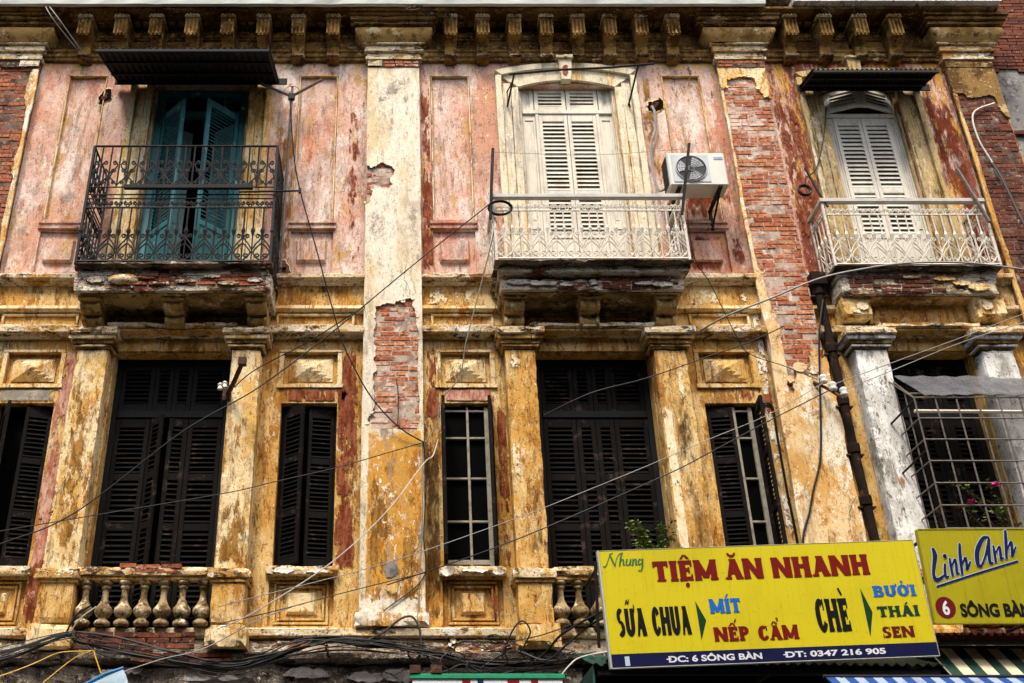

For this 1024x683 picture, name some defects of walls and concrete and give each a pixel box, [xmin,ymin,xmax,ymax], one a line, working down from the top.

flaking render [0,68,36,237]
peeling [348,103,396,230]
flaking render [922,91,1024,299]
flaking render [645,59,826,389]
peeling [86,275,104,283]
flaking render [120,273,266,286]
flaking render [589,277,718,303]
peeling [853,302,868,313]
flaking render [848,275,993,310]
flaking render [272,295,521,576]
flaking render [119,563,184,574]